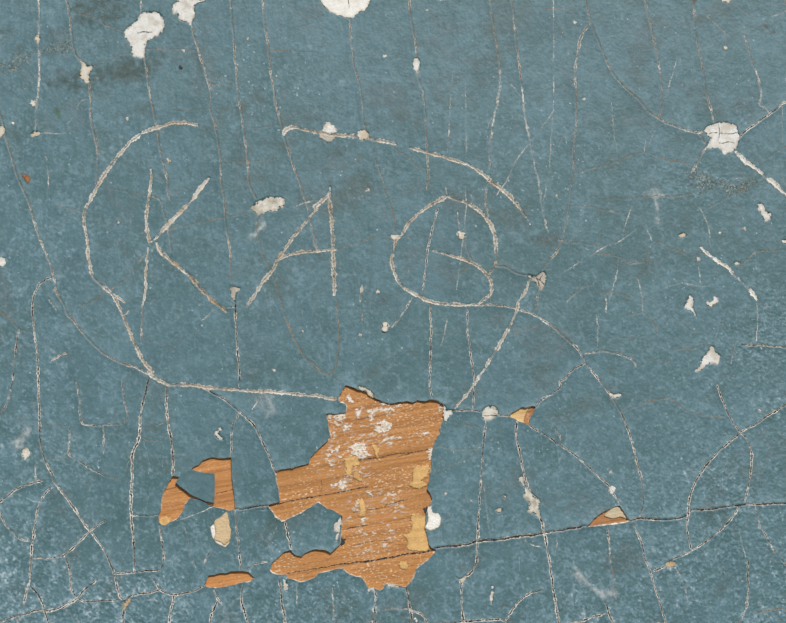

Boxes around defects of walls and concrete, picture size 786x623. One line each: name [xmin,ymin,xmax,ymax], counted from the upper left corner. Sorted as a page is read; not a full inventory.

crack [34,33,42,102]
peeling [124,12,165,58]
peeling [172,0,205,26]
peeling [321,0,370,18]
crack [570,0,714,191]
crack [739,35,786,138]
peeling [704,122,740,154]
crack [392,0,551,398]
crack [185,0,276,472]
peeling [159,458,235,525]
peeling [269,386,453,592]
crack [370,588,427,623]